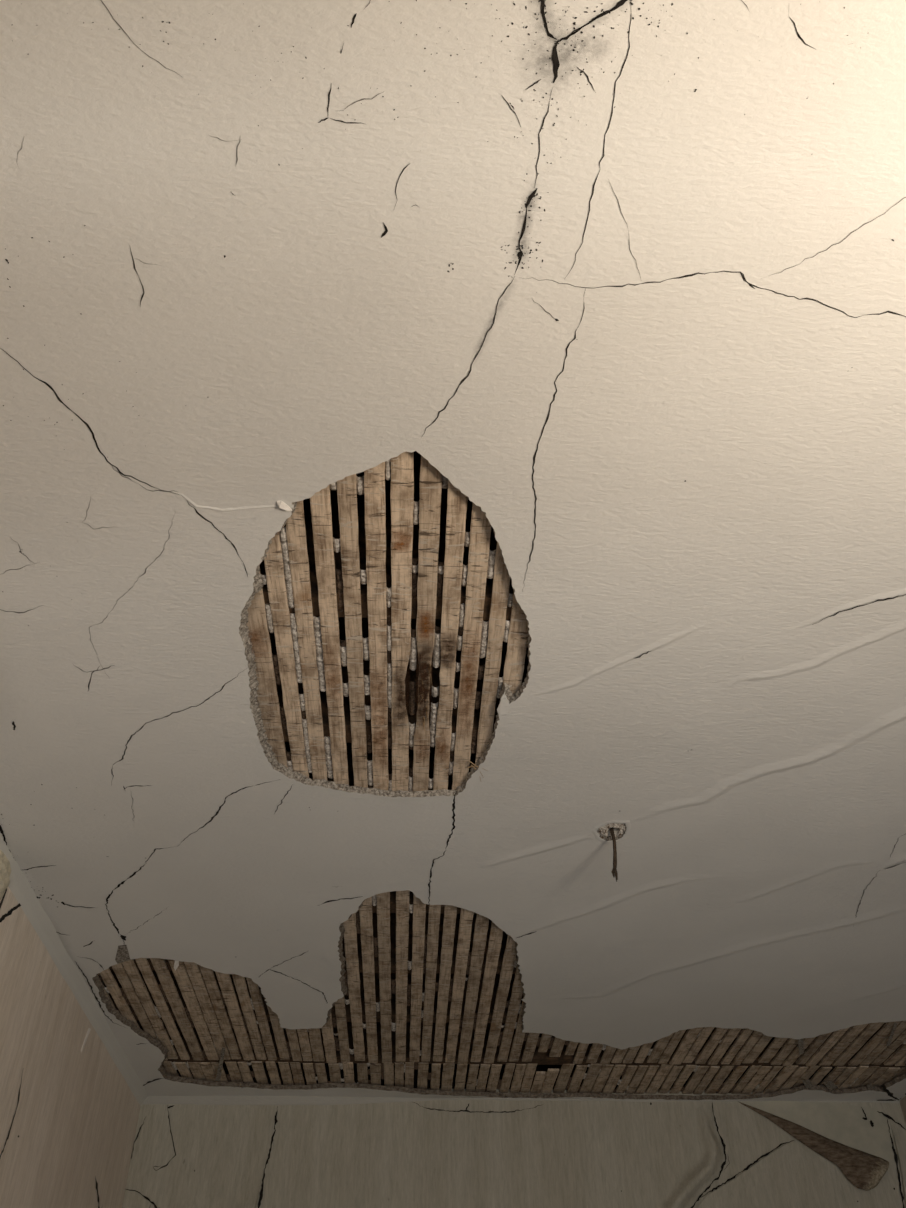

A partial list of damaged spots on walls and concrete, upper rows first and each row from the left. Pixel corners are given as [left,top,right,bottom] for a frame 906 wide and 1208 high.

crack [318,89,378,124]
crack [381,164,419,238]
crack [130,248,157,305]
crack [422,0,906,588]
crack [0,348,248,691]
spalling [239,501,532,797]
crack [812,594,906,625]
crack [111,671,243,815]
crack [0,825,56,870]
crack [57,781,292,1045]
crack [428,791,457,903]
spalling [92,895,906,1165]